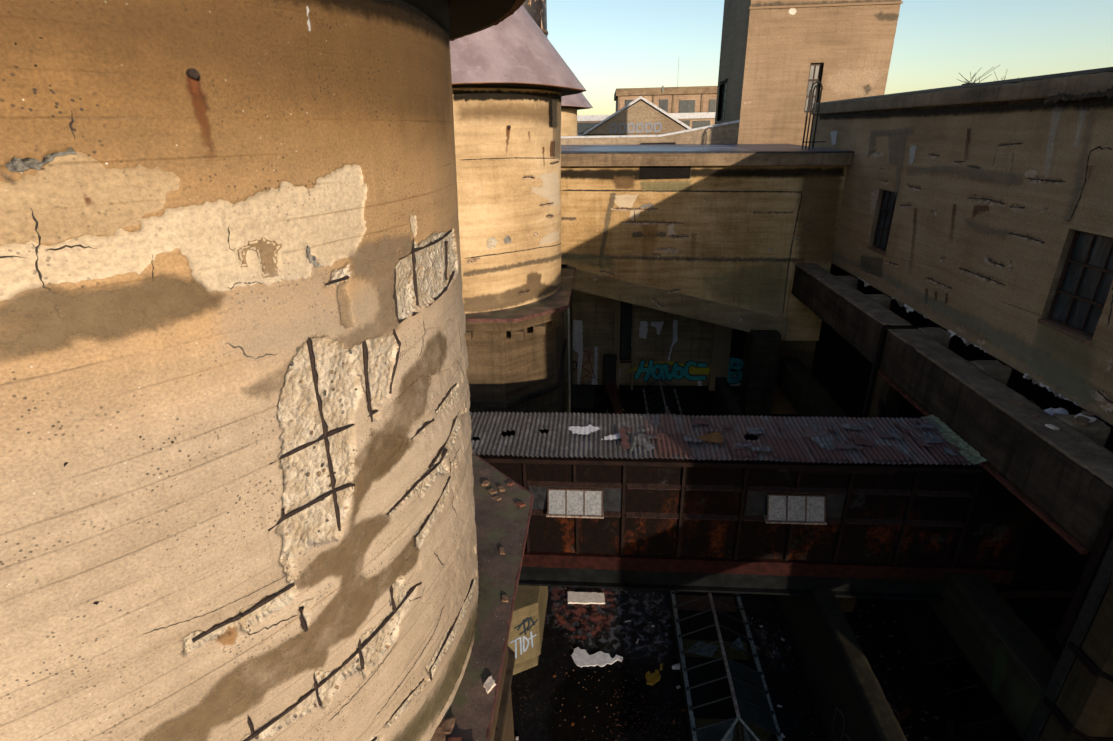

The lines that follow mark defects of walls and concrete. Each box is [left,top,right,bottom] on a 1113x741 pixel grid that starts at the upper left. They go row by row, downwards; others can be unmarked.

corrosion [186,68,209,130]
crack [0,209,96,289]
peeling [611,194,691,254]
crack [1064,146,1113,222]
damp [0,276,222,356]
damp [331,237,413,347]
peeling [0,147,514,656]
spalling [1023,373,1113,427]
damp [143,333,446,741]
spalling [240,575,422,741]